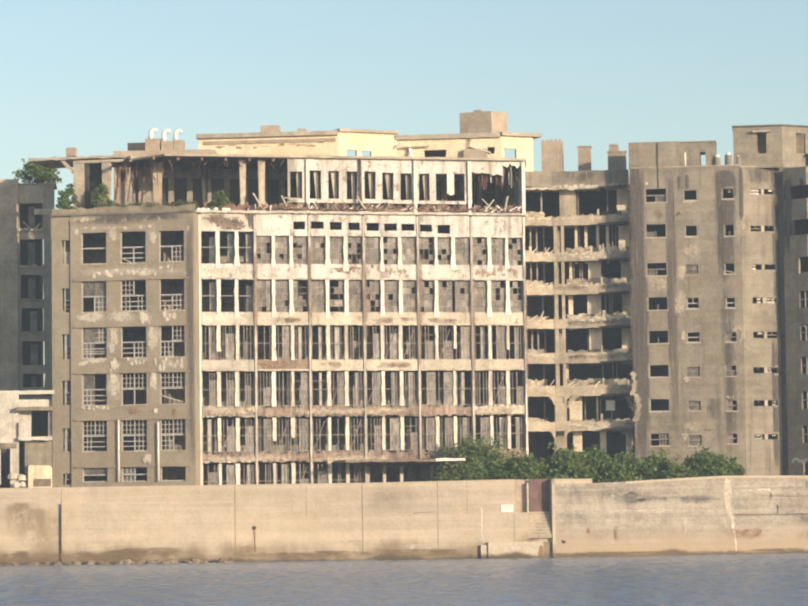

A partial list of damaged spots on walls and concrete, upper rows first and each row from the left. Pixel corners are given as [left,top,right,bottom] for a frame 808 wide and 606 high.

peeling [77,310,183,396]
spalling [568,371,642,431]
crack [731,496,797,551]